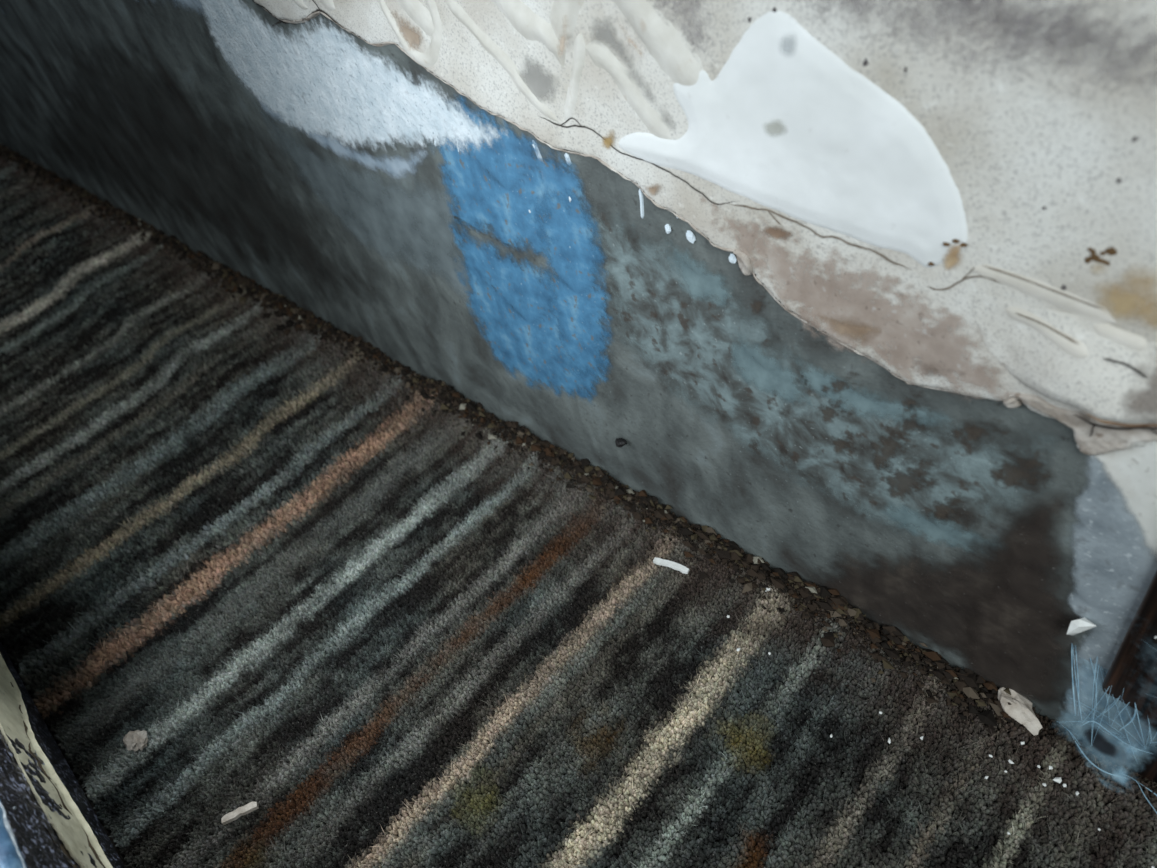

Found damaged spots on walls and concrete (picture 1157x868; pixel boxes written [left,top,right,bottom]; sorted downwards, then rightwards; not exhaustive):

leakage [823,0,1154,83]
leakage [177,0,611,400]
leakage [639,186,658,219]
spalling [255,2,1157,552]
leakage [721,220,1008,399]
leakage [818,499,1073,703]